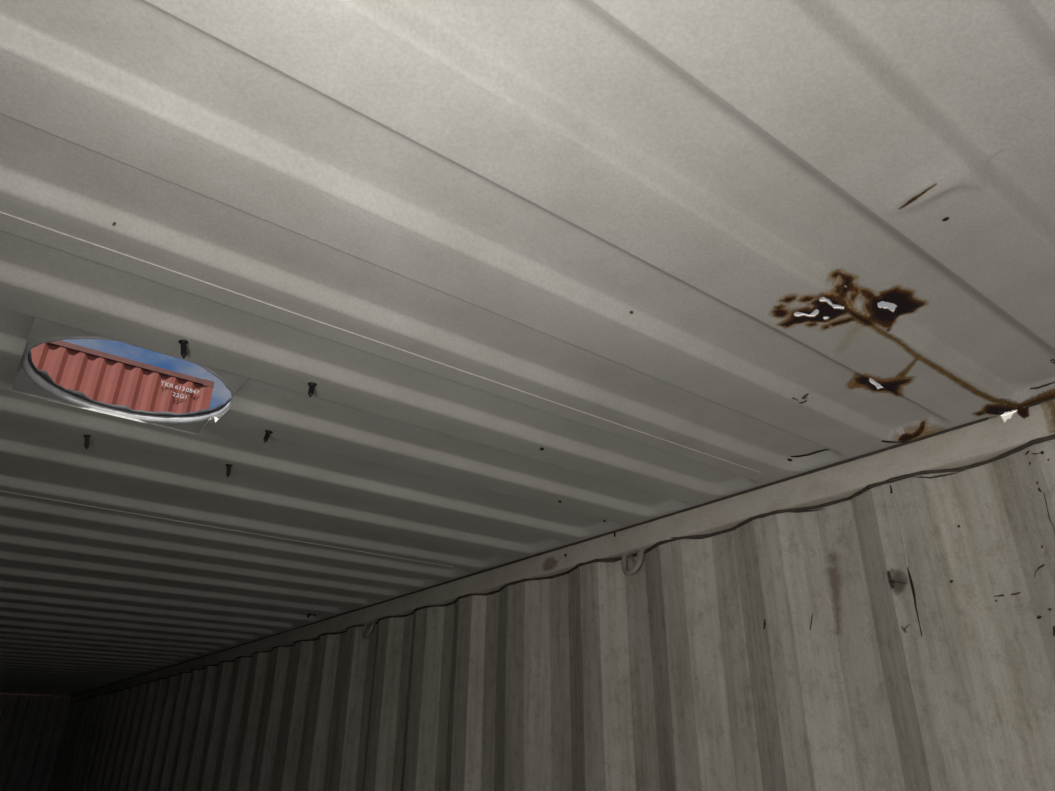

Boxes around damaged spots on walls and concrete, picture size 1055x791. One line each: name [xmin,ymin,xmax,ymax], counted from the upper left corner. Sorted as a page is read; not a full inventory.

corrosion [772,269,1055,432]
crack [890,485,922,636]